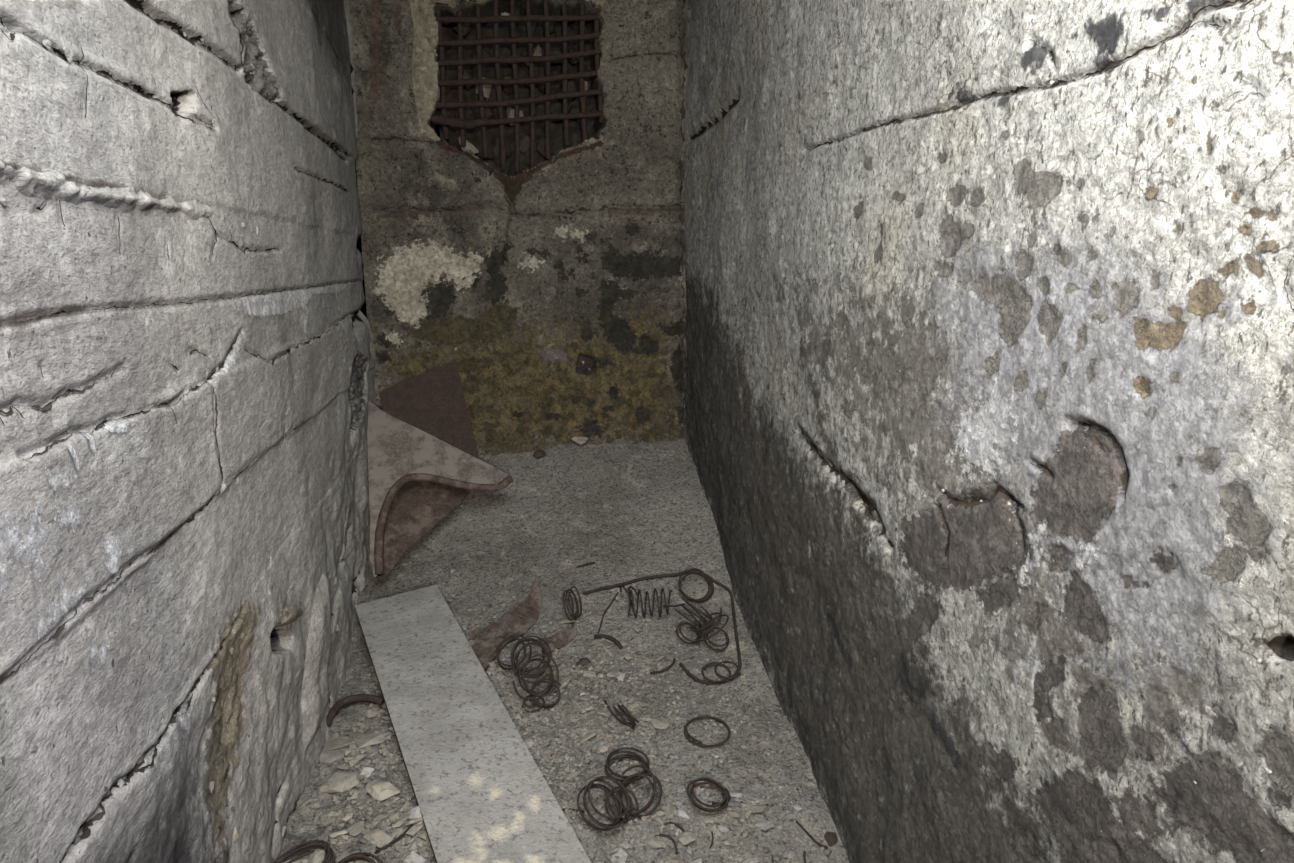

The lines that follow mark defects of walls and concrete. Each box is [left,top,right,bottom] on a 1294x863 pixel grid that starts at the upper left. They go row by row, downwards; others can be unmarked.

crack [0,18,216,131]
crack [125,0,244,71]
spalling [228,0,283,104]
spalling [409,0,489,141]
crack [810,0,1253,150]
corrosion [437,140,603,251]
peeling [1013,158,1085,211]
crack [0,280,363,683]
water stain [372,223,1070,863]
peeling [761,183,1294,863]
water stain [929,223,1250,690]
crack [60,610,242,863]